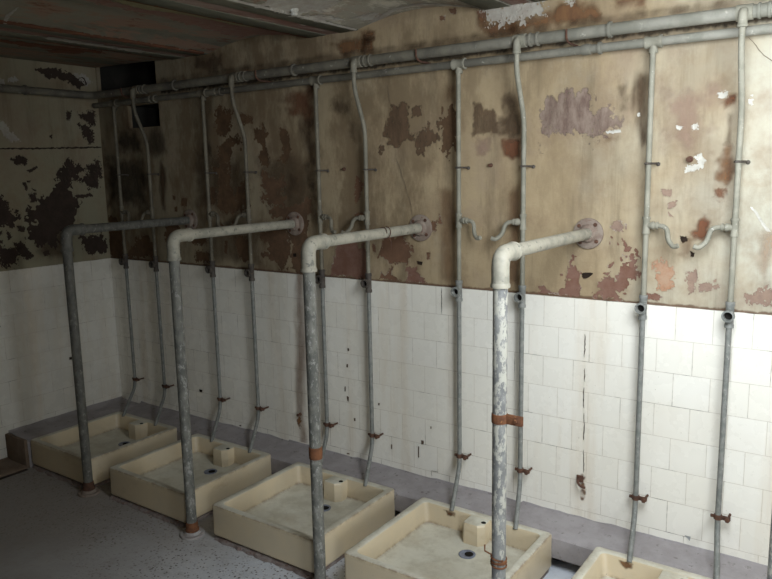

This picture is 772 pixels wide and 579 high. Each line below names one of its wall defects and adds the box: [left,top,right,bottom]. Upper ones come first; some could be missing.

spalling [440,0,549,30]
peeling [378,102,456,161]
peeling [539,88,624,144]
peeling [0,155,103,269]
damp [110,162,147,207]
peeling [210,104,312,274]
peeling [191,238,210,264]
peeling [538,220,641,302]
peeling [646,257,721,302]
peeling [743,284,772,307]